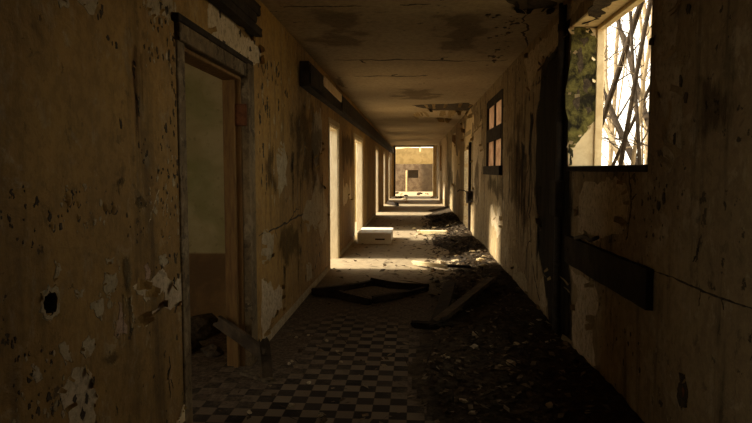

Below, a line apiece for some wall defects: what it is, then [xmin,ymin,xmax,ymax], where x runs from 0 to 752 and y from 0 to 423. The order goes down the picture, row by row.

peeling [207,3,288,134]
crack [346,14,529,77]
peeling [411,103,484,206]
peeling [573,176,630,243]
hole [39,284,61,323]
peeling [114,248,182,340]
peeling [261,277,286,339]
peeling [569,270,598,369]
crack [654,271,752,310]
peeling [27,335,98,423]